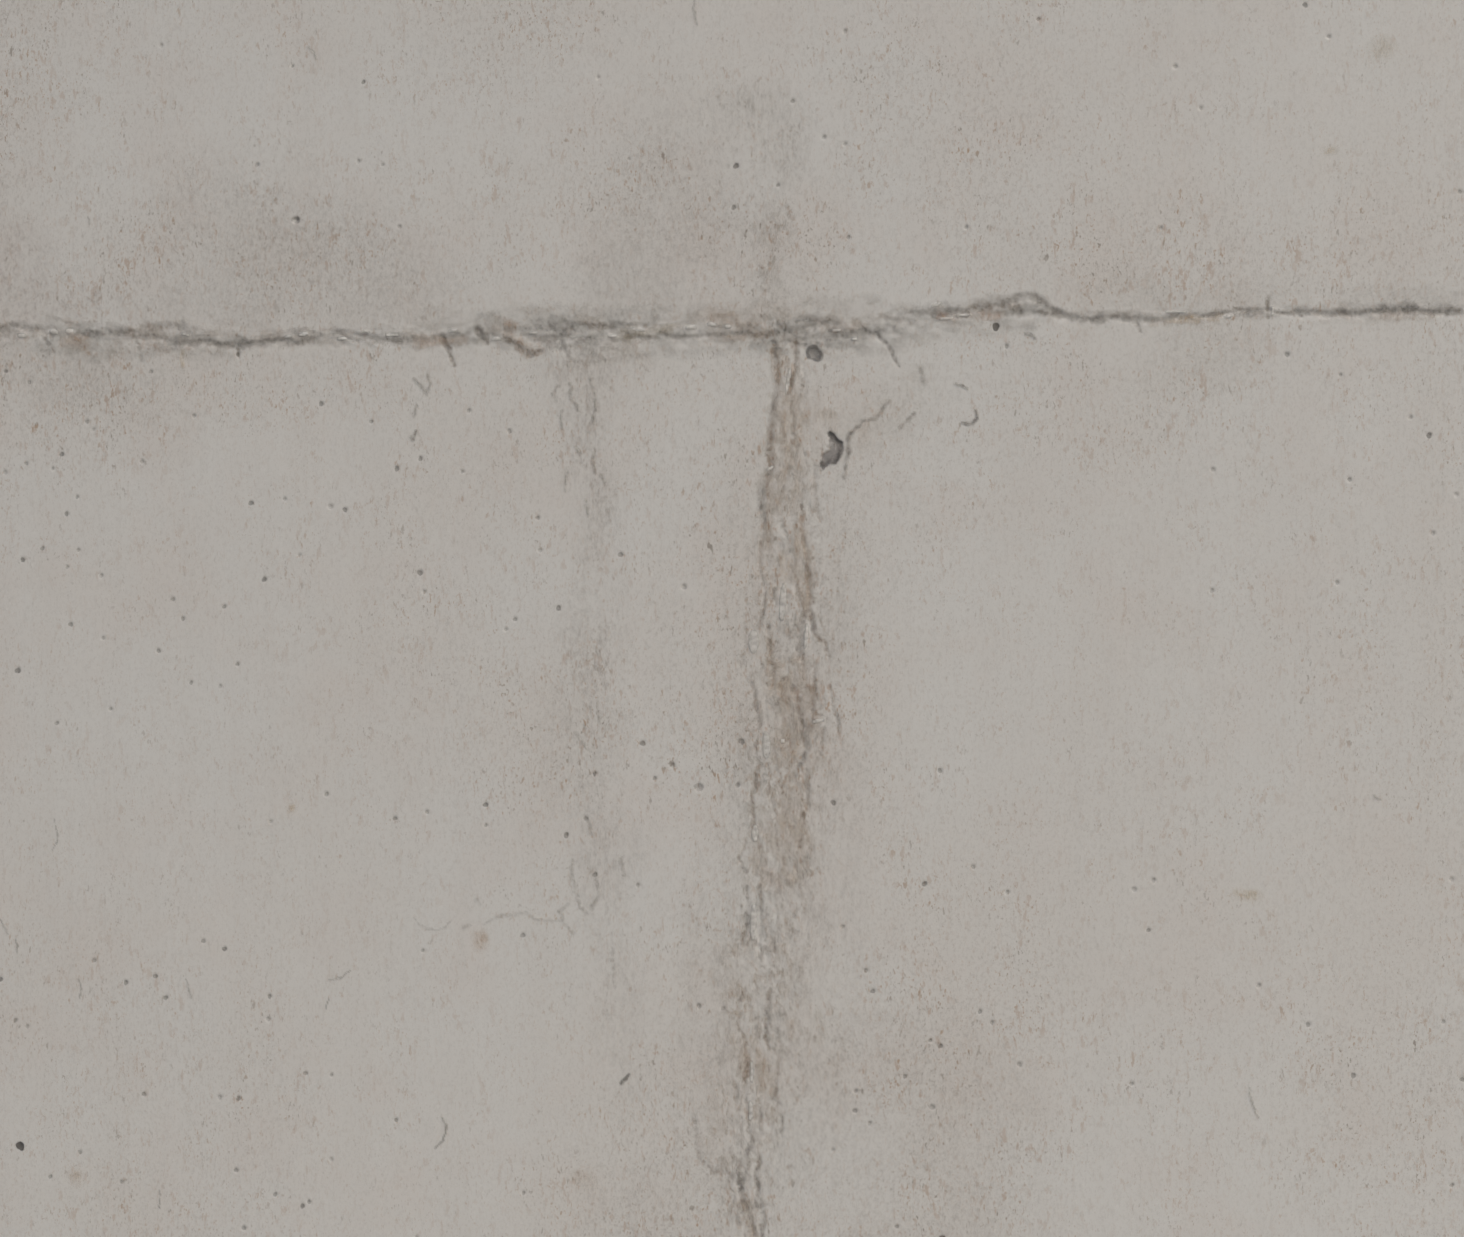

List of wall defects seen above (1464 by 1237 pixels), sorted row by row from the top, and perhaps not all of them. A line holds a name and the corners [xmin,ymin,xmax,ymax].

crack [284,330,399,340]
crack [443,323,645,355]
crack [686,318,879,394]